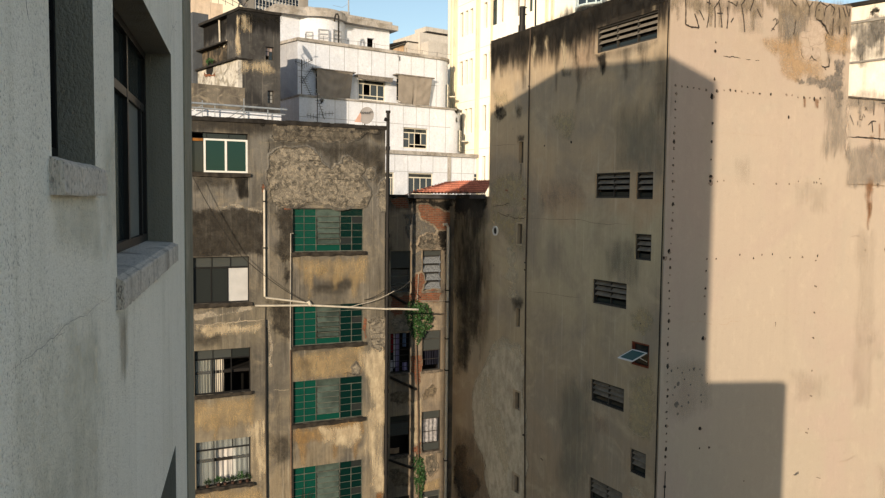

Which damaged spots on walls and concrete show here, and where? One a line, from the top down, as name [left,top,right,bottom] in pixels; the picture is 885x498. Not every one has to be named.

water stain [532,37,566,74]
spalling [786,60,845,108]
spalling [265,124,450,251]